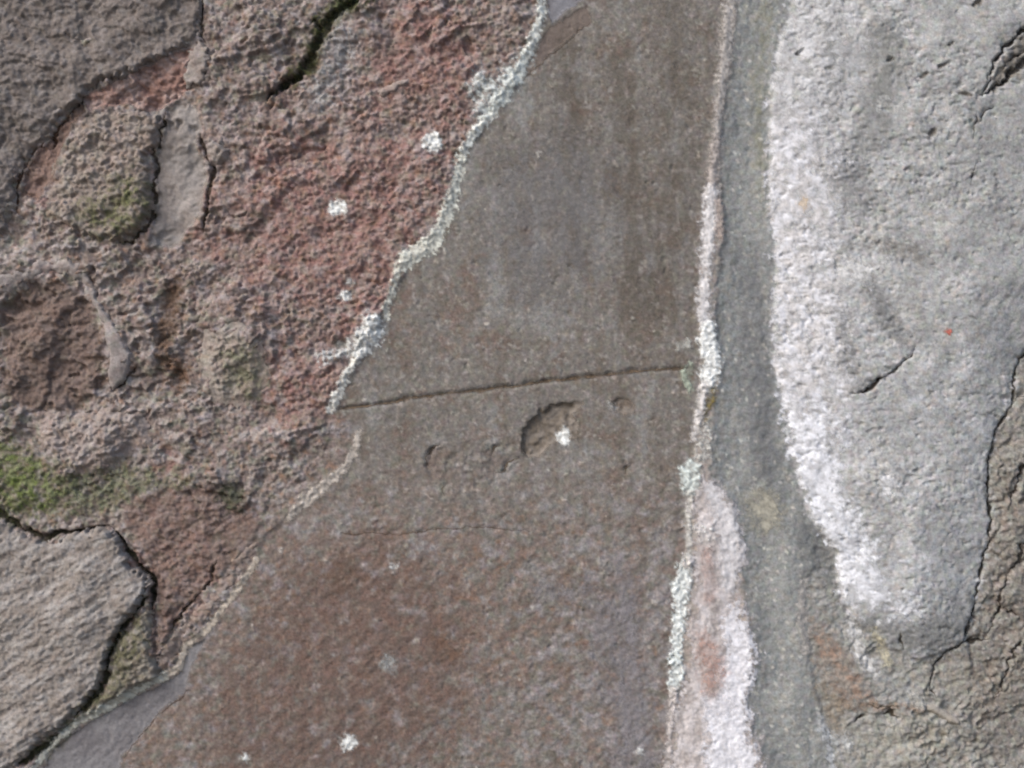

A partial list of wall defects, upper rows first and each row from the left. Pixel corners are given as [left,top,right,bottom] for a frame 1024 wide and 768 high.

crack [267,0,359,101]
water stain [287,0,369,112]
crack [16,89,90,215]
crack [116,110,167,244]
crack [200,135,217,232]
water stain [318,0,546,413]
crack [341,367,684,409]
water stain [600,0,783,768]
crack [854,353,913,394]
crack [929,354,1024,699]
crack [0,510,217,764]